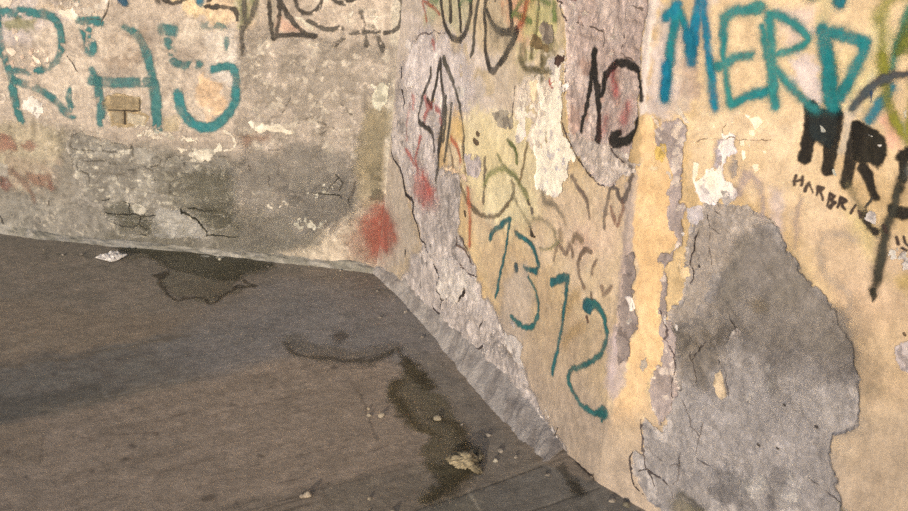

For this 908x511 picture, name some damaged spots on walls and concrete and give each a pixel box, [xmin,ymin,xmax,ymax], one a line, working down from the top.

leakage [120,247,275,304]
crack [179,207,237,238]
flaking render [66,17,567,452]
flaking render [492,0,862,511]
peeling [864,211,876,224]
peeling [888,248,908,270]
leakage [287,347,475,500]